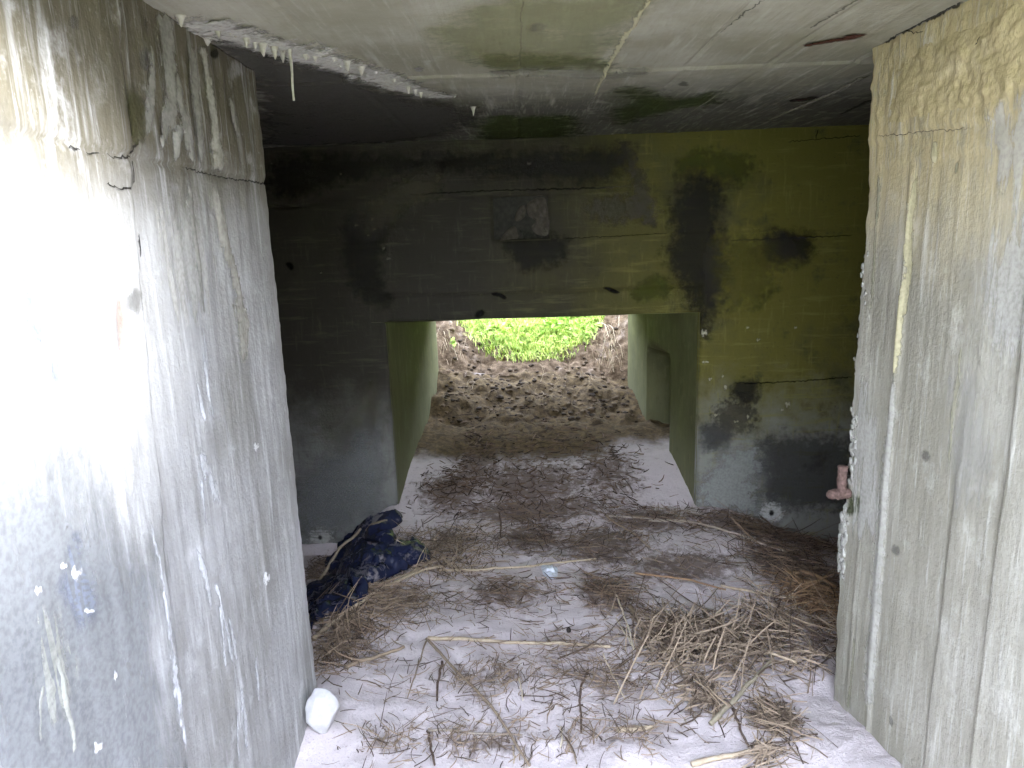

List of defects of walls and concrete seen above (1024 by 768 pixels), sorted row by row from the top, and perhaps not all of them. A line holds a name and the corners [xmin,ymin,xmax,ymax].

leakage [200,41,479,171]
crack [790,100,966,142]
crack [69,139,138,190]
crack [185,167,265,185]
leakage [209,186,249,362]
leakage [503,233,571,271]
leakage [663,170,729,340]
leakage [729,380,762,404]
crack [742,376,848,384]
spalling [847,406,858,487]
leakage [697,385,895,708]
spalling [837,502,849,581]